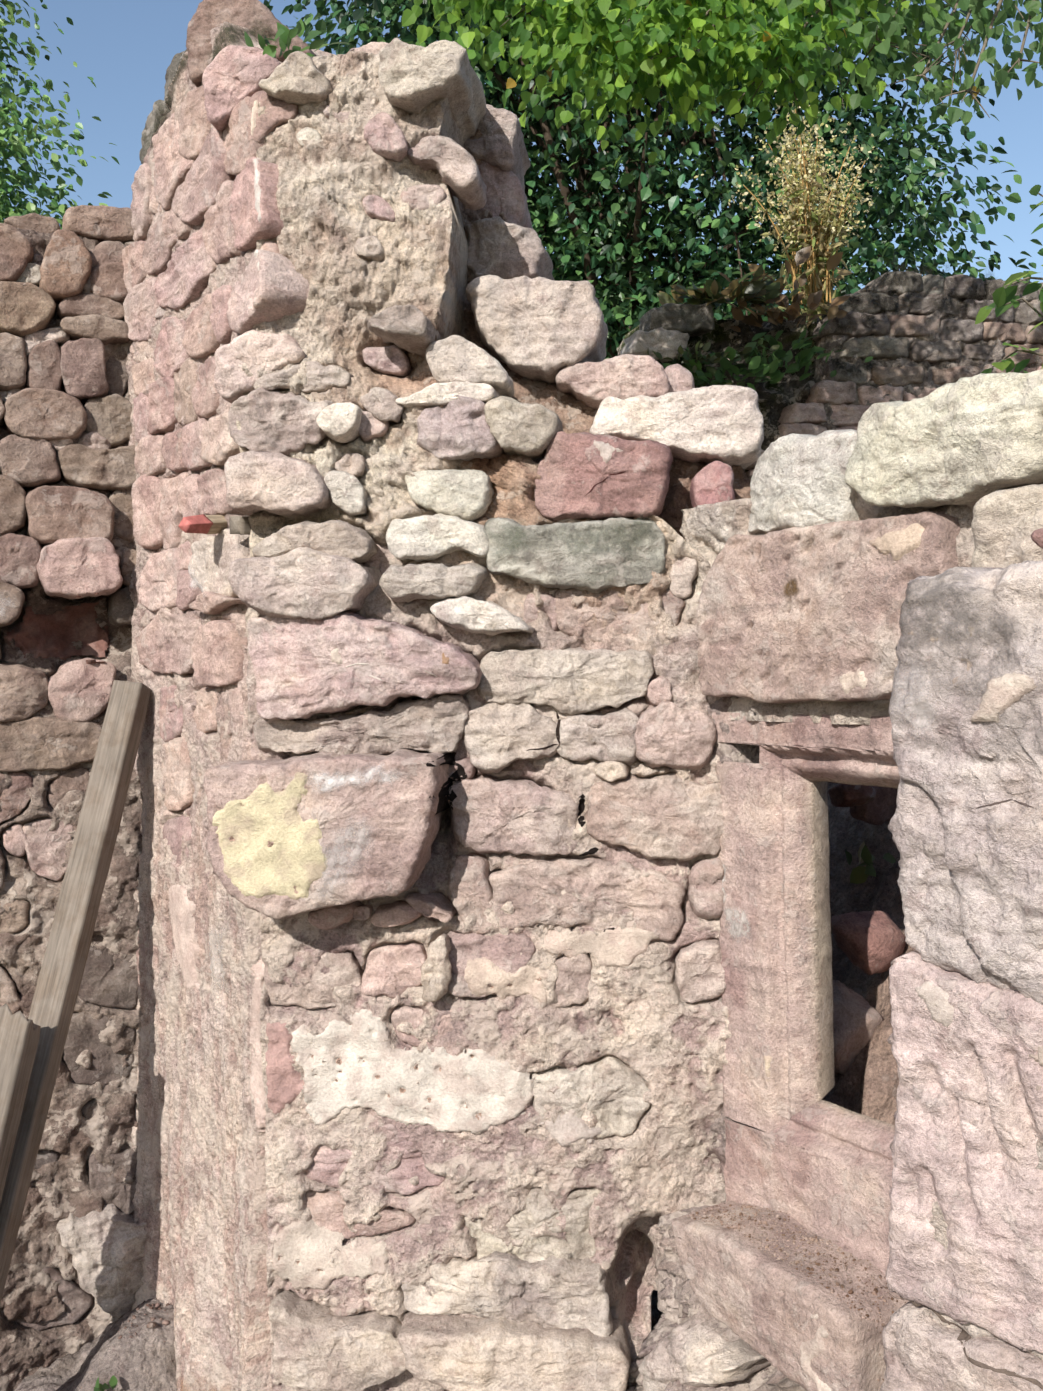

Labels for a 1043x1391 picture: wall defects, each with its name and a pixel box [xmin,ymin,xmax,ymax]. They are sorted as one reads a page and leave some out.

crack [887,1291,1043,1390]